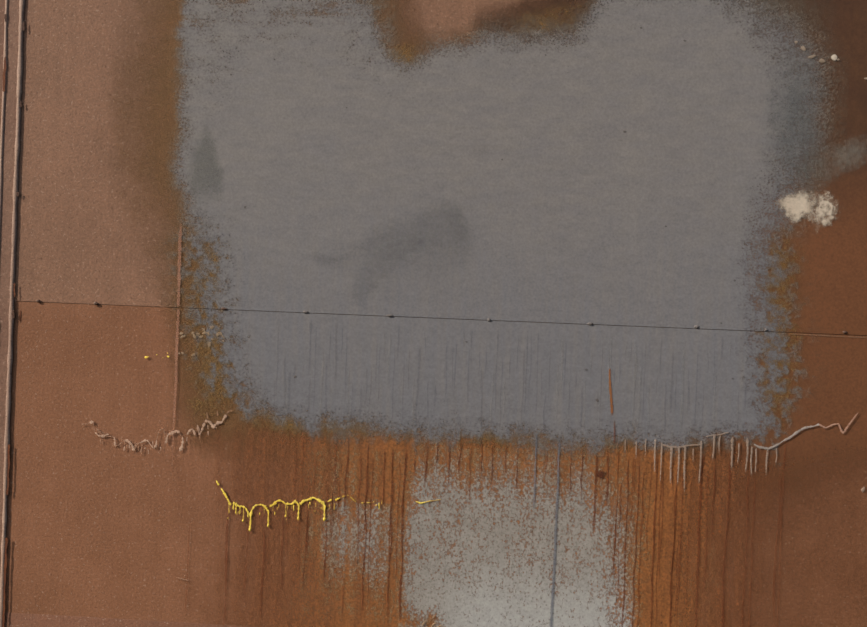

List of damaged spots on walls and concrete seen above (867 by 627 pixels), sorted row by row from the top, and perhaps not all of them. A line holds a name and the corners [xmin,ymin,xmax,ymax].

leakage [141,0,602,452]
leakage [604,0,867,504]
rust [225,369,754,627]